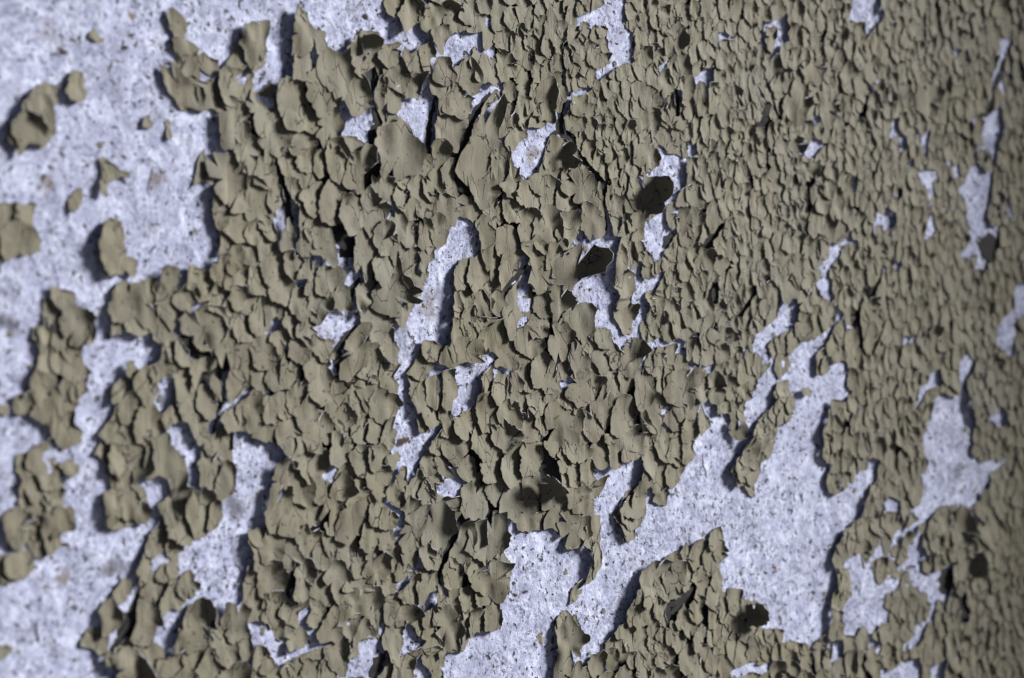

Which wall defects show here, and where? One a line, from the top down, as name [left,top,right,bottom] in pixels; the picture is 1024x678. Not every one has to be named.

crack [274,162,295,229]
crack [365,68,383,178]
crack [426,92,491,196]
crack [550,75,608,231]
peeling [548,0,816,382]
peeling [803,137,828,159]
crack [976,232,998,262]
crack [180,334,224,434]
crack [332,277,361,385]
peeling [560,359,576,389]
crack [110,585,143,652]
crack [936,567,968,619]